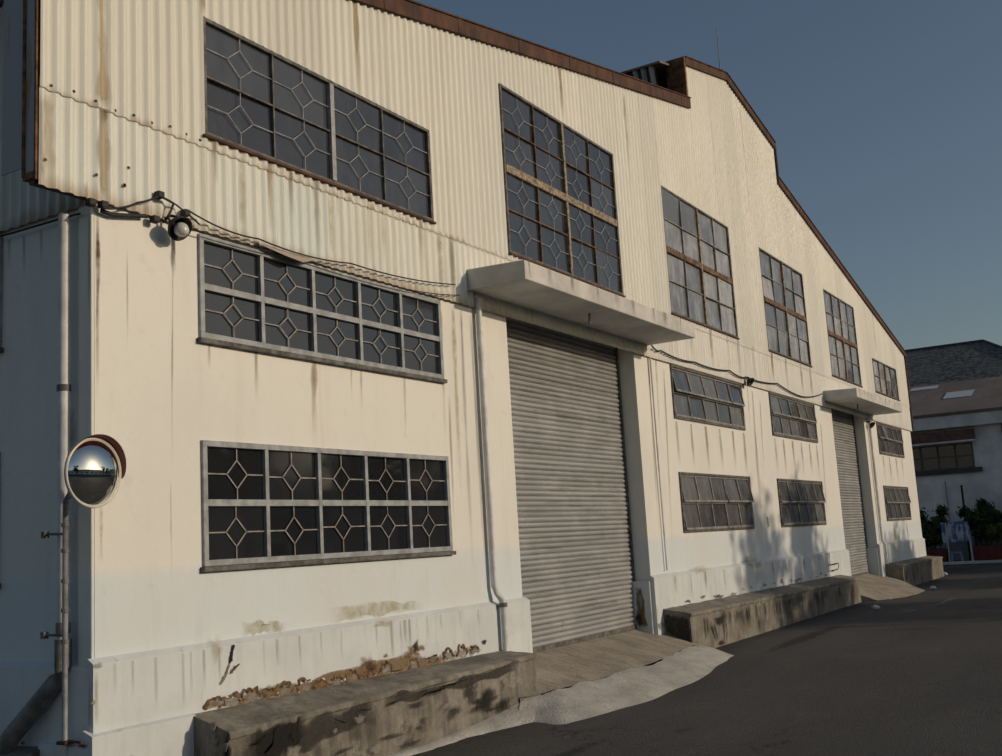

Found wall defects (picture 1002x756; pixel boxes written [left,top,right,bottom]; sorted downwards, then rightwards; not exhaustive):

corrosion [100,0,108,191]
spalling [636,590,648,626]
crack [220,645,240,685]
peeling [203,640,486,710]